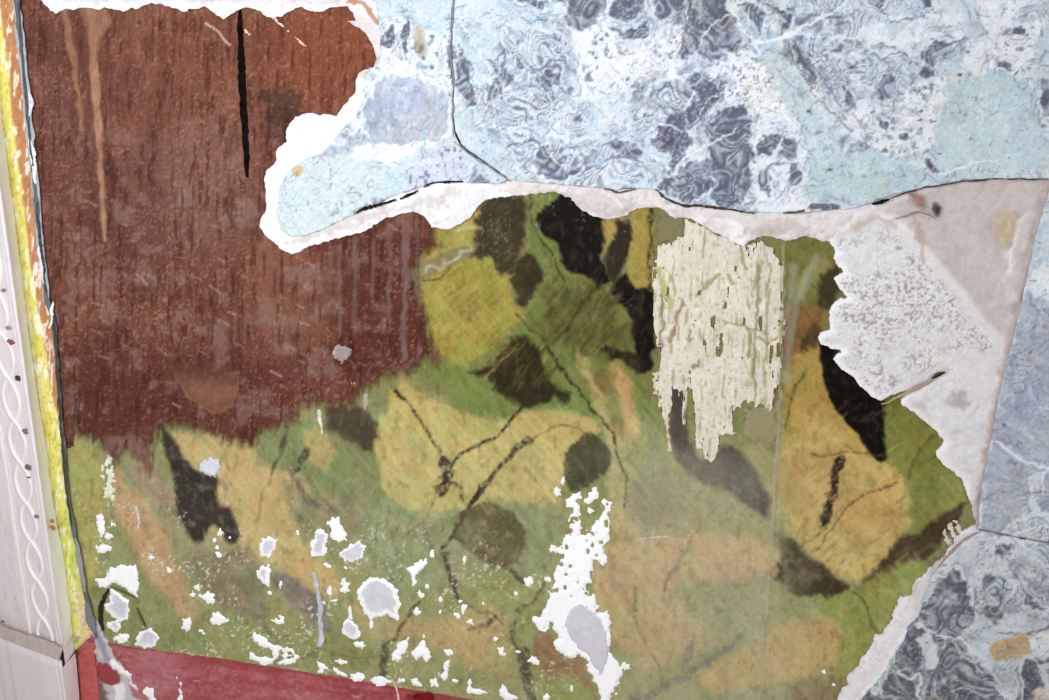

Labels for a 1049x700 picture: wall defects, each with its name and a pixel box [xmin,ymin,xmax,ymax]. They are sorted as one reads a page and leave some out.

crack [237,9,250,178]
flaking render [41,0,511,254]
flaking render [503,178,1049,700]
peeling [96,514,116,553]
peeling [92,564,160,700]
peeling [181,584,229,634]
peeling [256,536,282,595]
peeling [249,632,299,666]
peeling [310,517,402,649]
peeling [392,634,432,662]
peeling [317,649,518,700]
peeling [406,550,434,616]